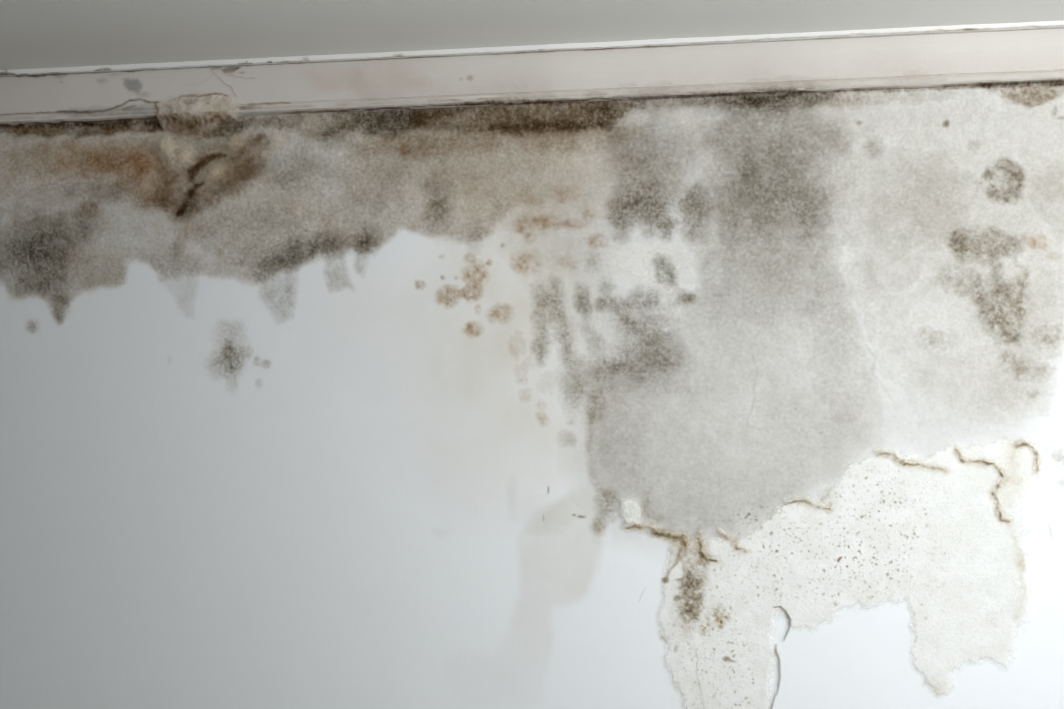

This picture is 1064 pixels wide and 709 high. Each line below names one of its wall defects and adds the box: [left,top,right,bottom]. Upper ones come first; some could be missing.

leakage [75,122,130,134]
flaking render [658,441,1039,709]